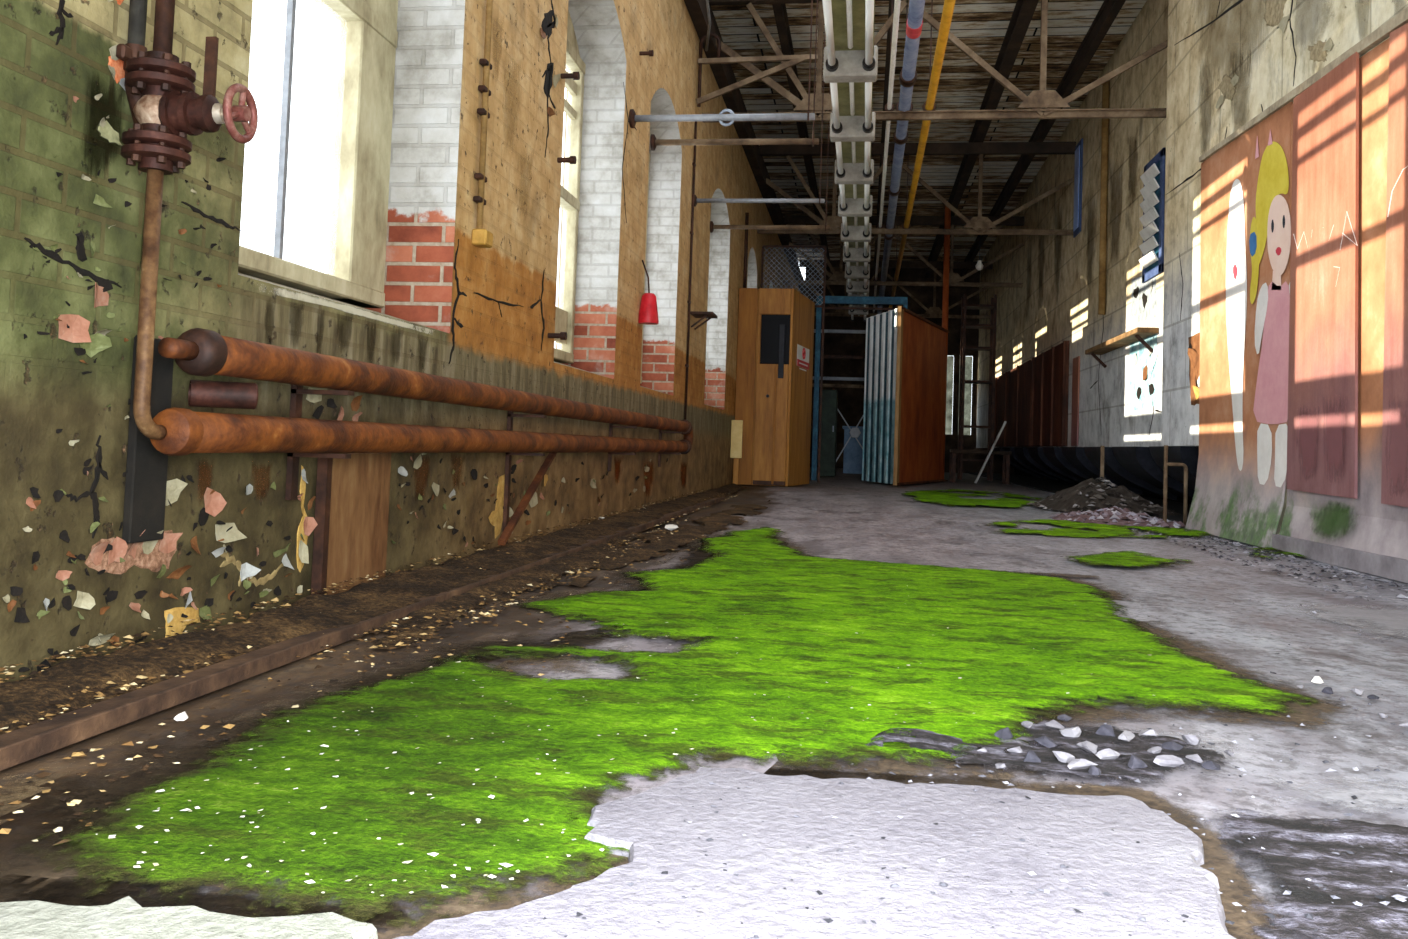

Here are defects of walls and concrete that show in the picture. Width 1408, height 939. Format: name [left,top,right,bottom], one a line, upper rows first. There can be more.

spalling [108,45,125,90]
peeling [98,118,123,146]
crack [24,237,122,288]
peeling [75,231,96,262]
peeling [58,279,113,358]
crack [449,239,545,364]
peeling [165,479,187,506]
peeling [282,465,318,572]
spalling [56,487,247,610]
peeling [240,563,261,581]
spalling [164,591,213,637]
peeling [89,633,115,646]